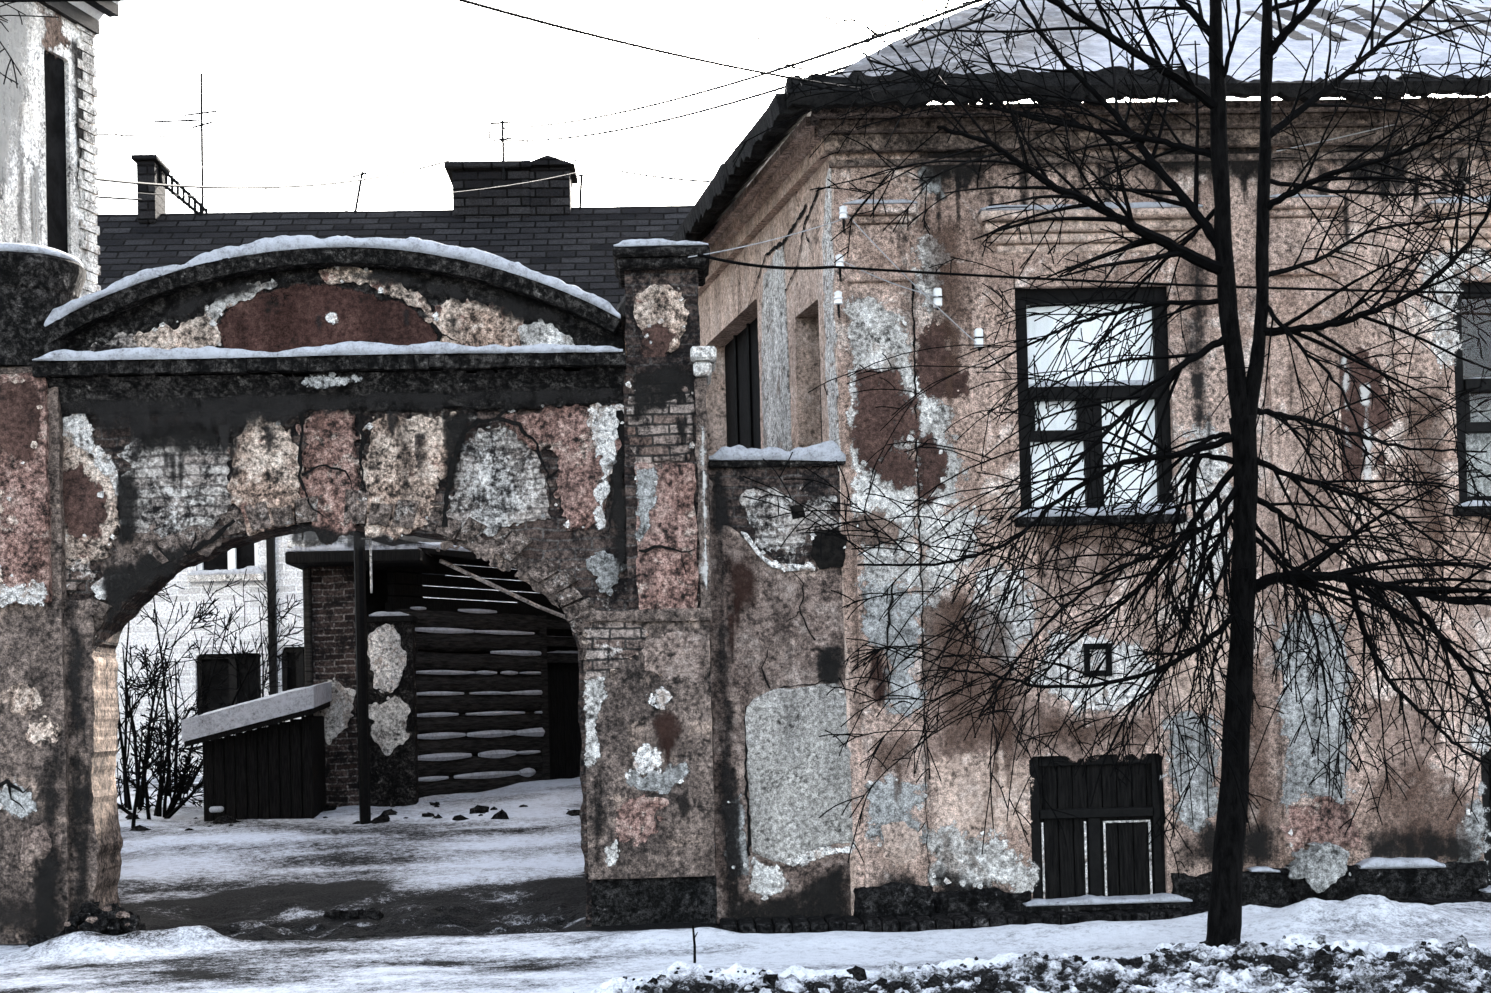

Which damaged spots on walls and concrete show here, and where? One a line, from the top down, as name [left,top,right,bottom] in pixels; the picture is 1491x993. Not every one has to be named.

flaking render [76,266,575,389]
flaking render [633,284,689,357]
flaking render [0,378,695,608]
peeling [708,166,1233,833]
flaking render [7,682,62,744]
flaking render [314,623,411,756]
flaking render [581,621,707,768]
flaking render [0,777,37,818]
flaking render [604,743,689,867]
flaking render [724,770,1039,900]